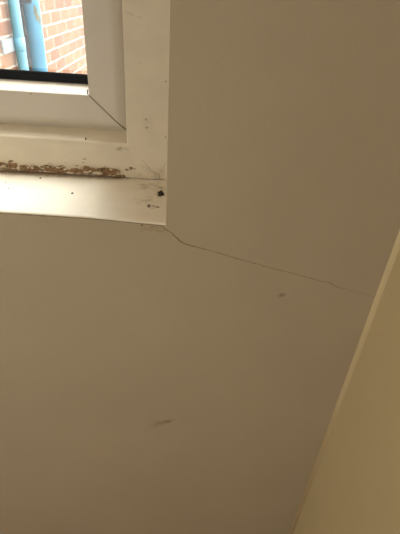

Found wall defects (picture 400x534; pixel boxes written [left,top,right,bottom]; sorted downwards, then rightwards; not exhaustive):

peeling [0,160,133,178]